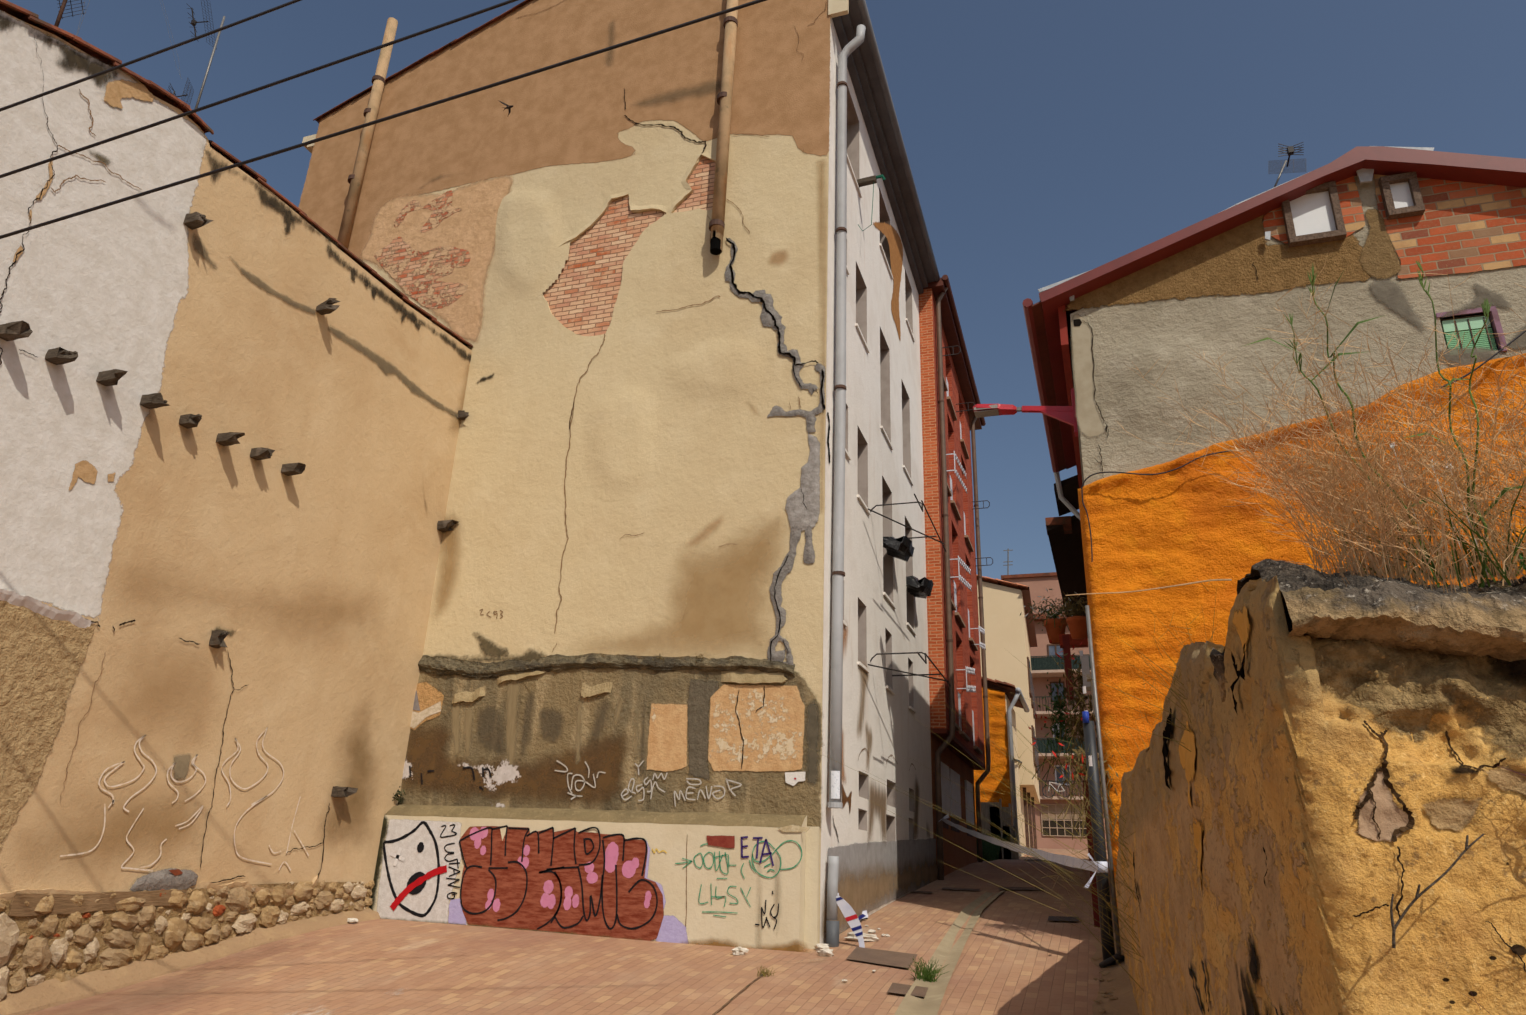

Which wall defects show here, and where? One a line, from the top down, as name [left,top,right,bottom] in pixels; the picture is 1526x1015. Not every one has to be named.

crack [0,35,140,365]
damp [193,236,216,267]
damp [235,262,316,314]
damp [255,184,471,362]
damp [329,327,464,426]
flaking render [543,151,716,336]
flaking render [1336,174,1526,279]
crack [552,334,605,652]
crack [657,199,830,769]
crack [179,638,247,883]
peeling [708,671,805,772]
flaking render [1297,638,1526,842]